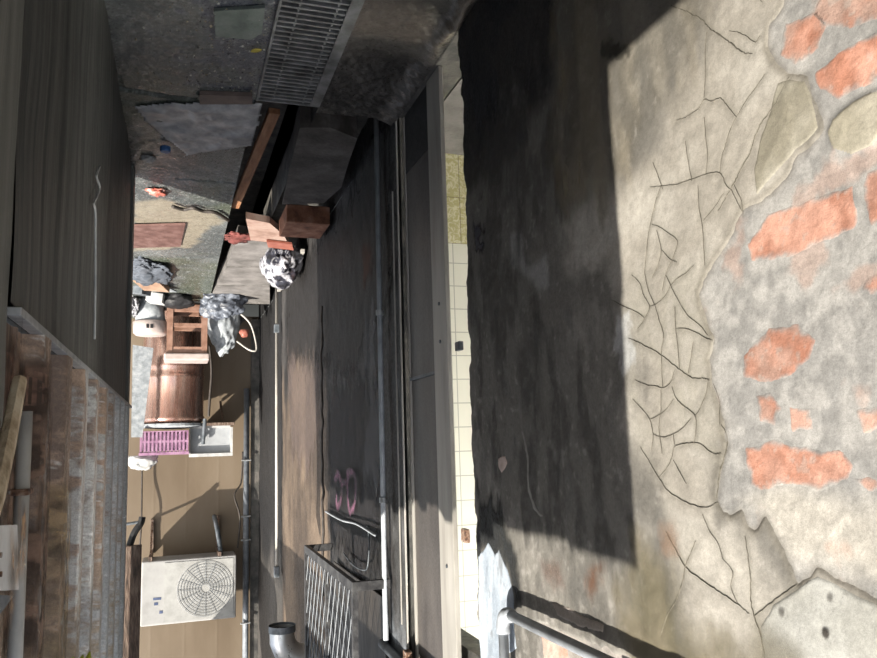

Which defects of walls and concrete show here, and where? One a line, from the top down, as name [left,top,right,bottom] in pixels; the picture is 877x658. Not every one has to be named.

crack [615,5,795,657]
spalling [699,0,877,599]